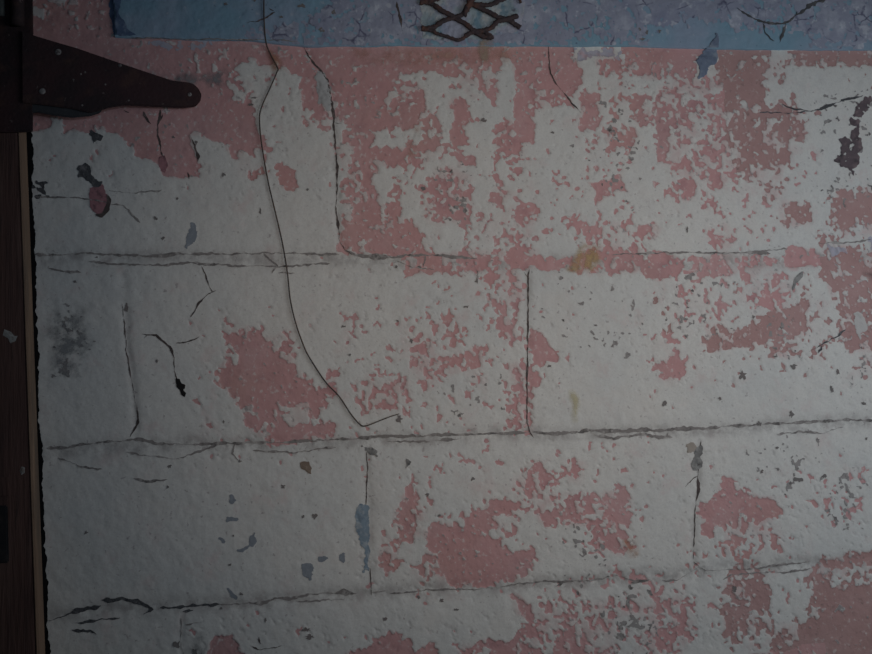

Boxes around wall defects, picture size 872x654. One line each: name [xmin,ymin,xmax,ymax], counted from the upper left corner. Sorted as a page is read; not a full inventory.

crack [738,0,825,42]
crack [34,8,479,316]
spalling [28,180,49,199]
peeling [33,0,872,478]
crack [614,247,787,255]
crack [820,237,871,245]
crack [47,269,872,654]
peeling [349,439,698,654]
peeling [301,556,328,581]
peeling [192,634,245,654]